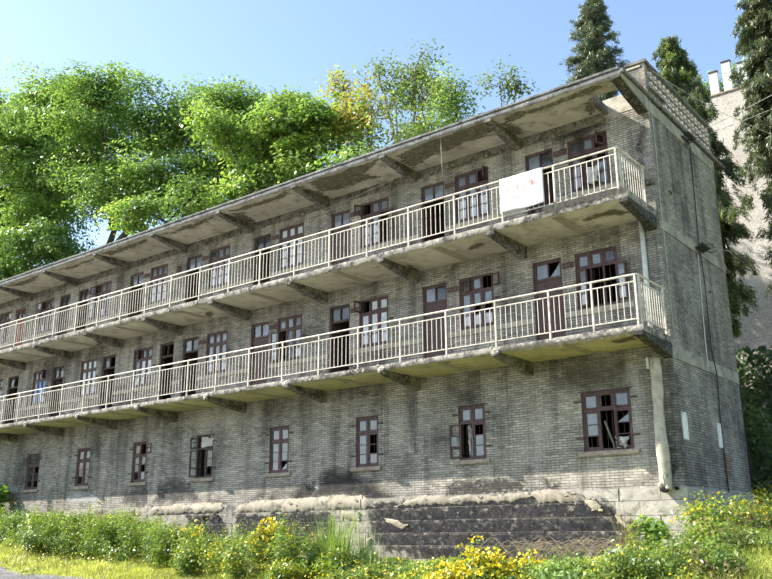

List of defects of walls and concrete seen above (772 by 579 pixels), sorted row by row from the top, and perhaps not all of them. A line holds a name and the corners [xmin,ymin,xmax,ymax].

flaking render [151,502,223,515]
flaking render [234,494,375,521]
spalling [385,518,409,529]
flaking render [393,489,603,511]
water stain [366,478,644,561]